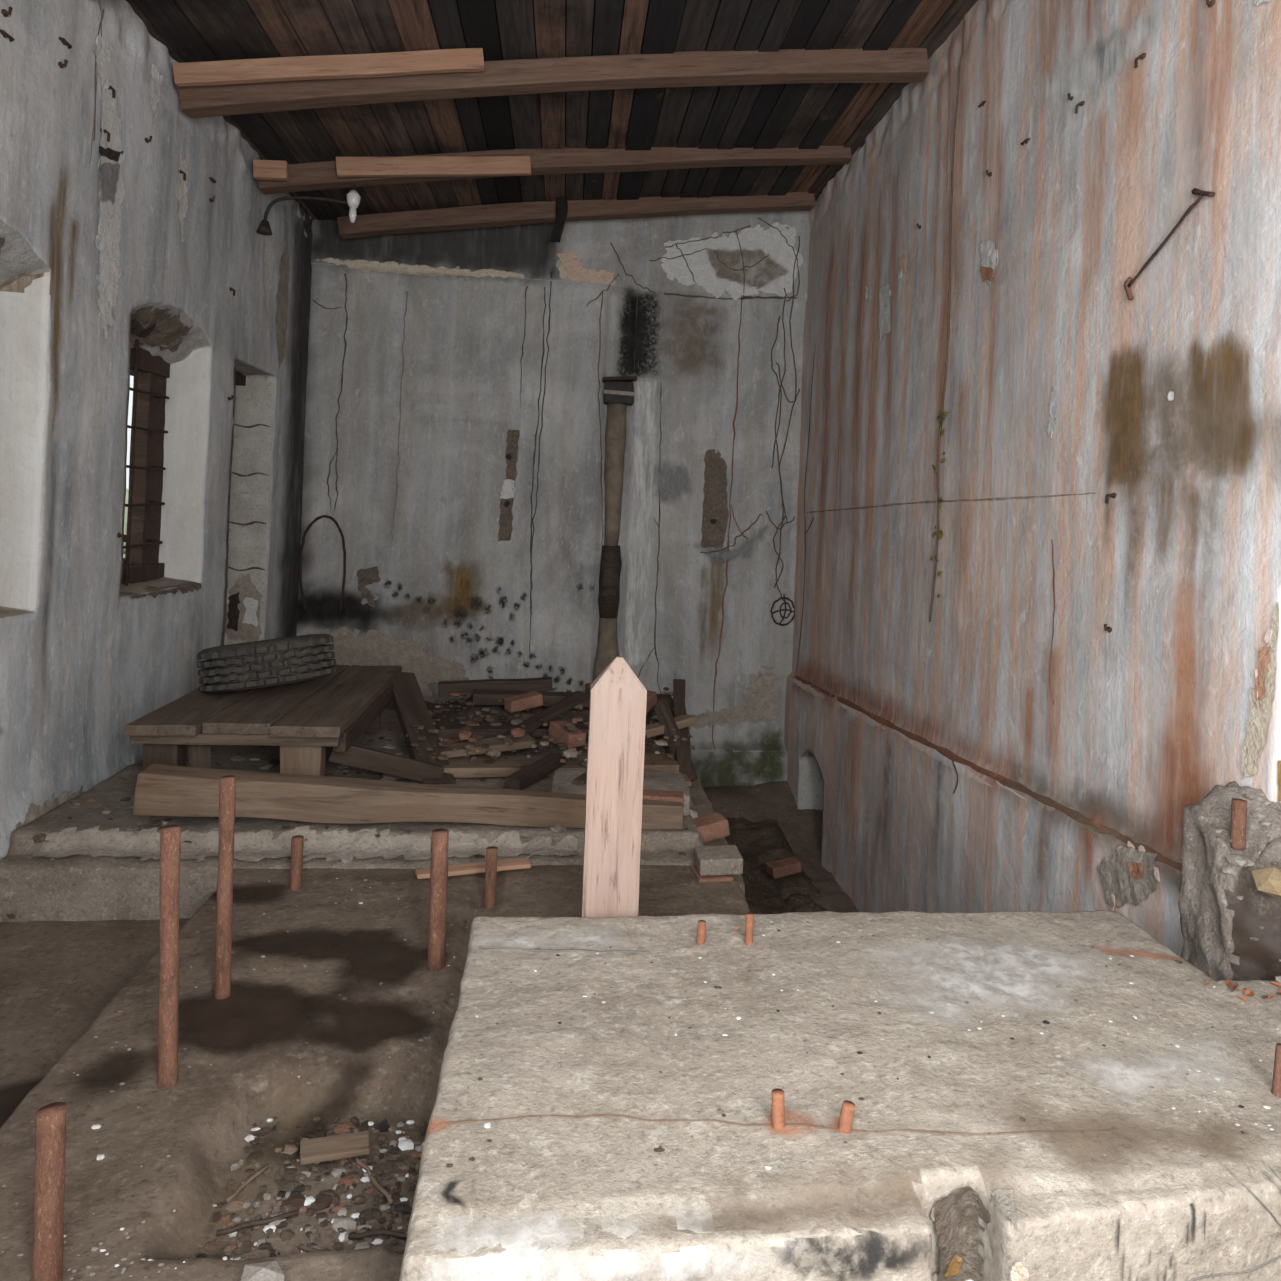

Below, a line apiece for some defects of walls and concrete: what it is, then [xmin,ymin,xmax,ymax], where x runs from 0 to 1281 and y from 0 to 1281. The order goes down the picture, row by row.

peeling [661,222,803,300]
corrosion [821,245,891,516]
damp [1107,338,1251,533]
damp [385,567,583,686]
corrosion [959,593,1199,888]